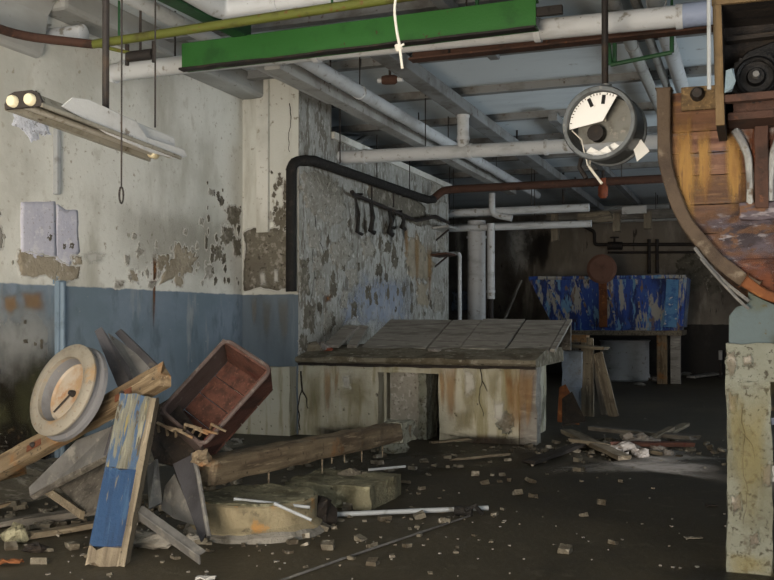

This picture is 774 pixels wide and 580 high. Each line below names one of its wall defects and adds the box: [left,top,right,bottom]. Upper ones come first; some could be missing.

flaking render [11,243,83,284]
flaking render [113,168,286,293]
flaking render [298,255,336,353]
peeling [321,234,350,299]
flaking render [350,183,447,321]
peeling [0,315,48,389]
damp [0,366,42,452]